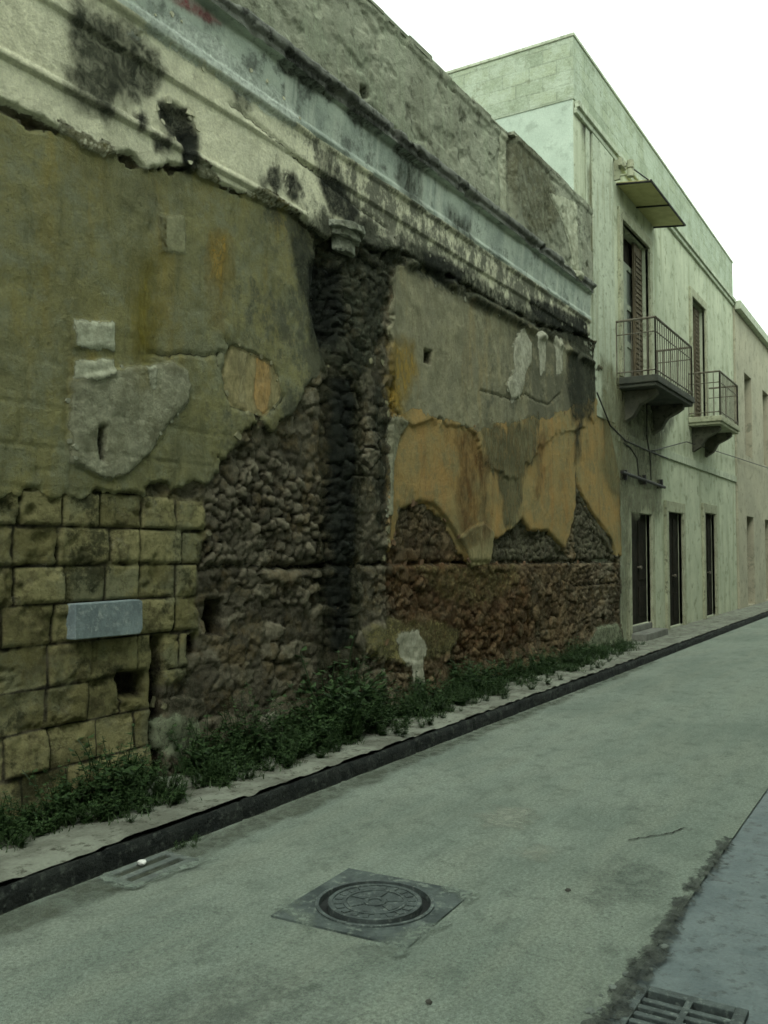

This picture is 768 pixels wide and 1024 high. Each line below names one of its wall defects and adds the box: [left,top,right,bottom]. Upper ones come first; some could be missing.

leakage [66,0,171,151]
spalling [156,95,200,173]
leakage [262,166,302,200]
leakage [507,137,557,230]
peeling [221,343,281,416]
peeling [506,323,588,404]
leakage [292,160,416,708]
peeling [382,398,622,569]
leakage [567,339,673,629]